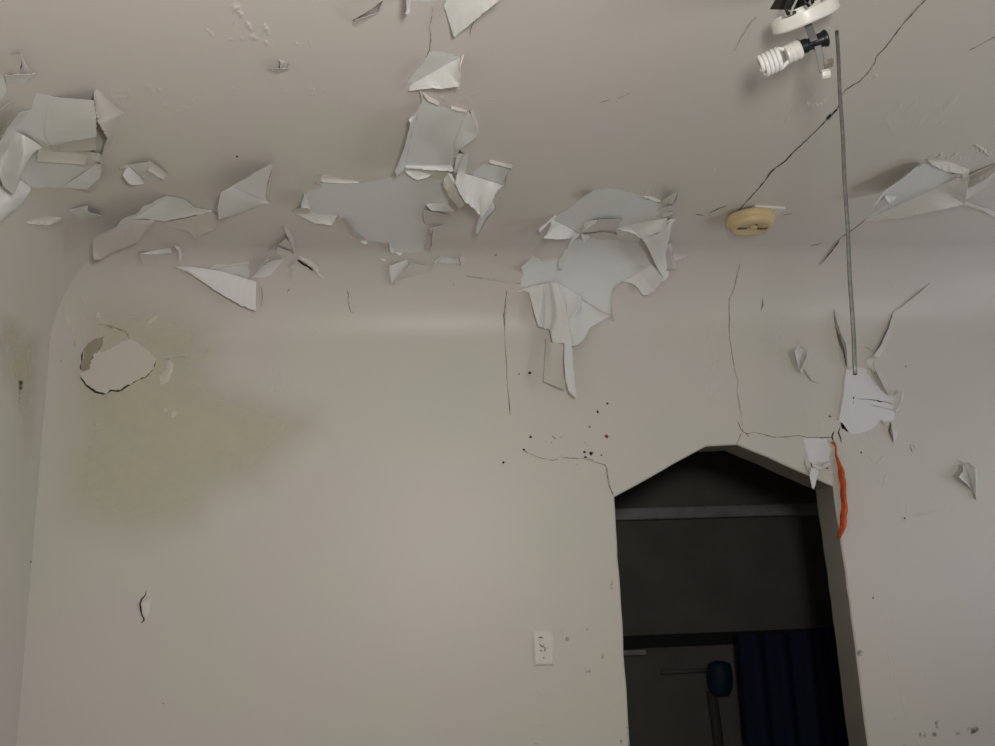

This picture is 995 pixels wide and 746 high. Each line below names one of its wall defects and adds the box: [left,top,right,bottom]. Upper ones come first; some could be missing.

peeling [405,0,500,37]
peeling [0,89,125,221]
spalling [80,336,104,371]
peeling [93,161,325,311]
peeling [291,51,514,285]
peeling [518,188,691,397]
crack [729,265,831,443]
crack [696,0,926,216]
peeling [831,283,931,443]
peeling [866,159,995,222]
crack [531,454,614,495]
peeling [803,438,835,489]